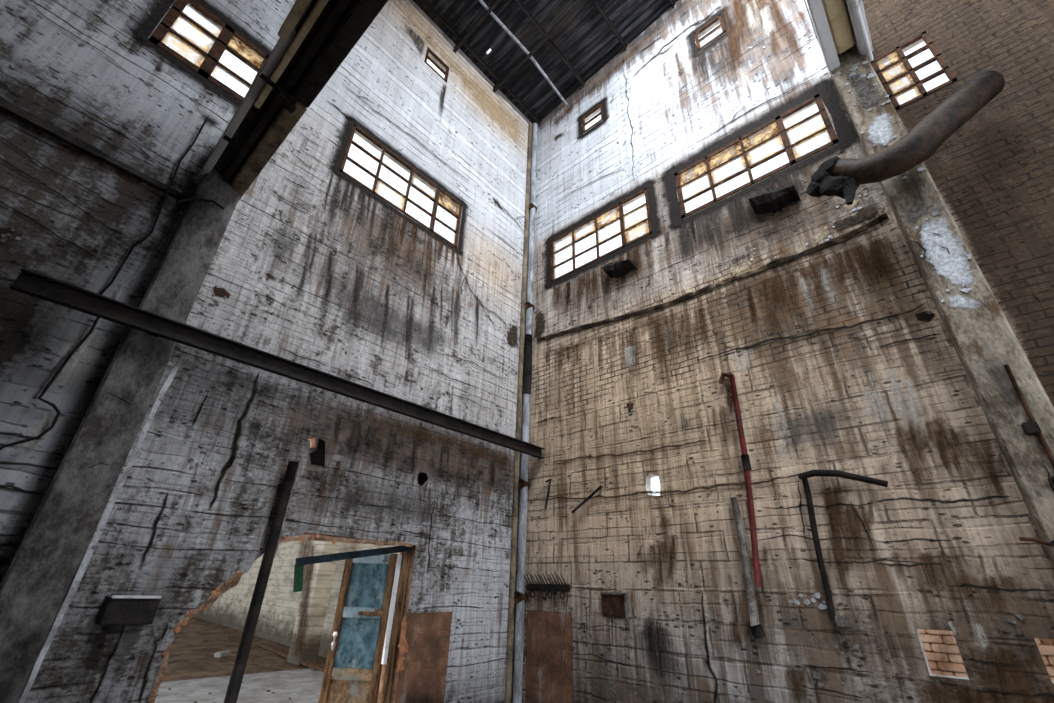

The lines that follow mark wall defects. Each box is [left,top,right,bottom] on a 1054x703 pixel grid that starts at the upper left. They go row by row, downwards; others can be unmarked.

leakage [693,34,740,75]
leakage [325,174,393,245]
leakage [299,233,317,295]
leakage [322,253,461,358]
crack [210,373,259,507]
crack [141,492,169,566]
spalling [280,534,412,547]
crack [89,625,125,703]
spalling [148,570,244,703]
leakage [639,620,679,678]
crack [701,593,718,703]